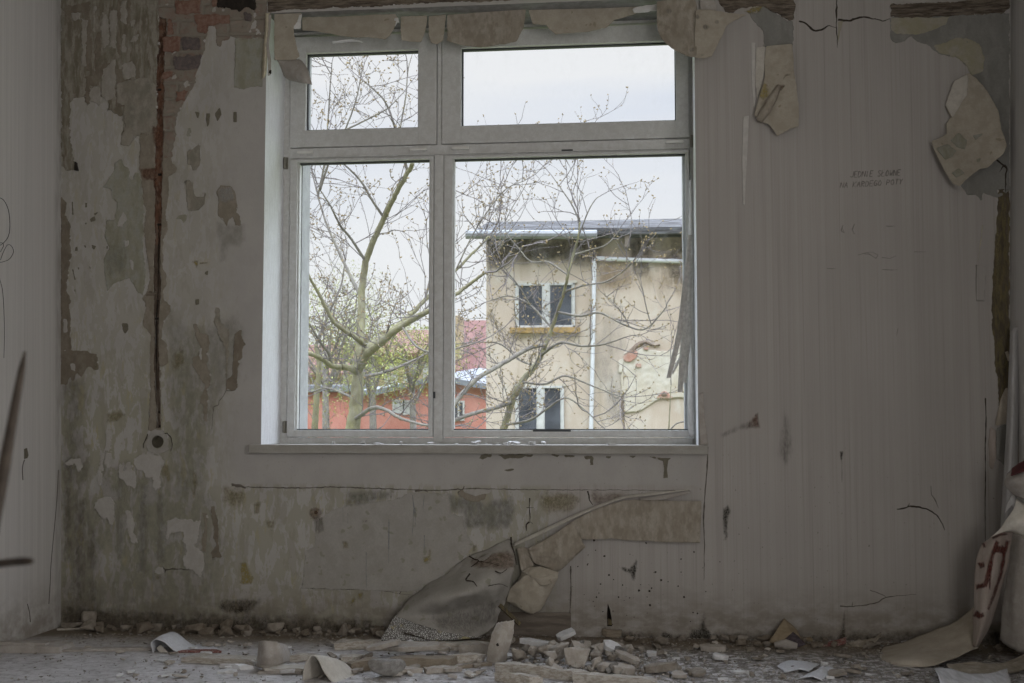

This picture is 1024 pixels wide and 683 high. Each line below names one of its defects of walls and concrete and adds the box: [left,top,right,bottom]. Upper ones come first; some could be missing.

peeling [60,0,513,431]
peeling [890,13,1010,404]
crack [154,225,162,395]
peeling [94,497,138,544]
peeling [118,453,165,490]
peeling [165,506,222,577]
peeling [301,492,474,592]
crack [897,492,945,530]